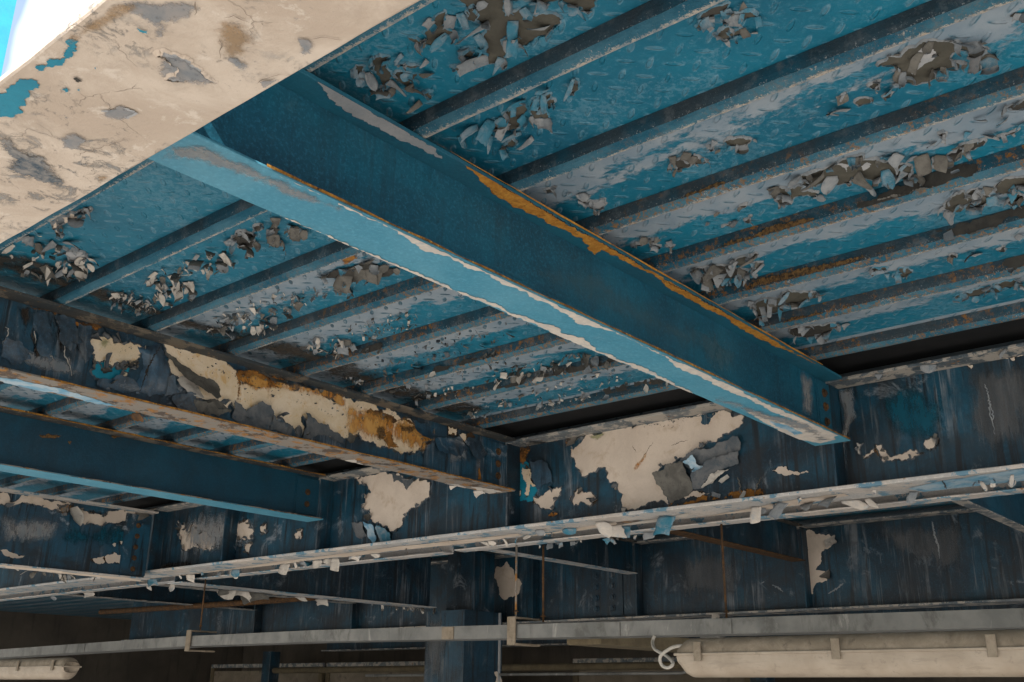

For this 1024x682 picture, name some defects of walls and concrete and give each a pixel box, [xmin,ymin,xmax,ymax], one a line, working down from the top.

peeling [318,0,598,161]
peeling [826,38,999,116]
peeling [767,98,1024,265]
rust [1,364,514,490]
peeling [0,202,880,606]
rust [267,152,864,439]
peeling [854,433,939,463]
peeling [911,362,939,373]